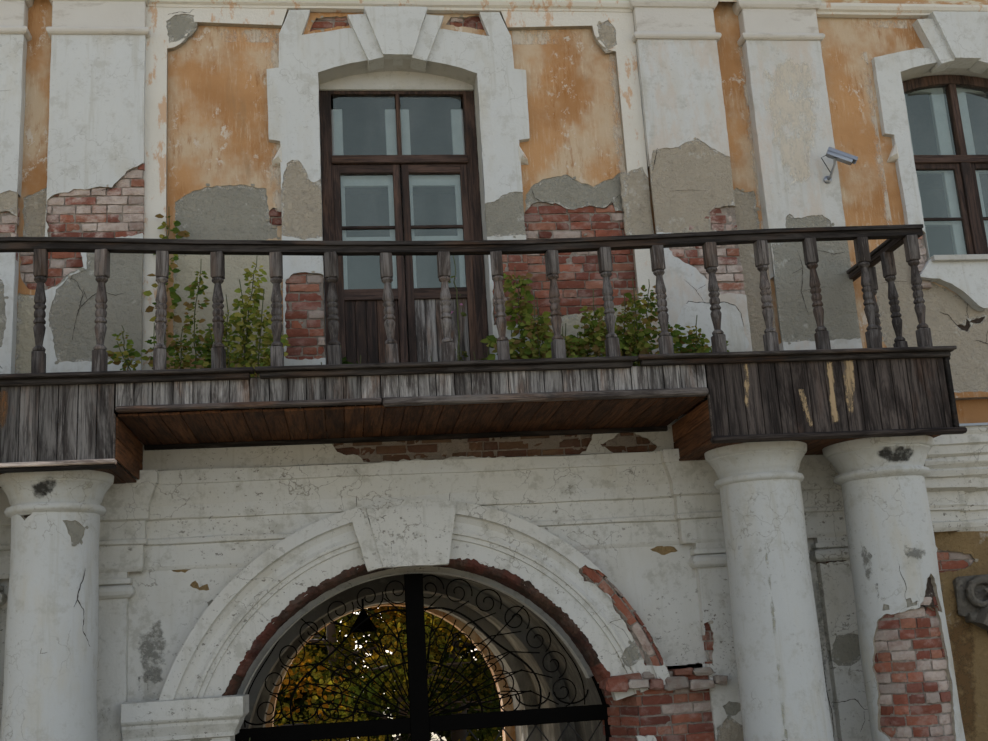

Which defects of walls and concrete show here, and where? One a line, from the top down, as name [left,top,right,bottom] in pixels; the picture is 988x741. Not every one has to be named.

flaking render [0,163,145,238]
peeling [266,160,322,240]
peeling [513,137,759,240]
peeling [4,252,85,374]
peeling [173,254,326,360]
flaking render [493,249,639,357]
flaking render [669,244,771,351]
flaking render [332,431,657,463]
crack [74,572,90,646]
flaking render [222,558,744,741]
flaking render [872,550,979,741]